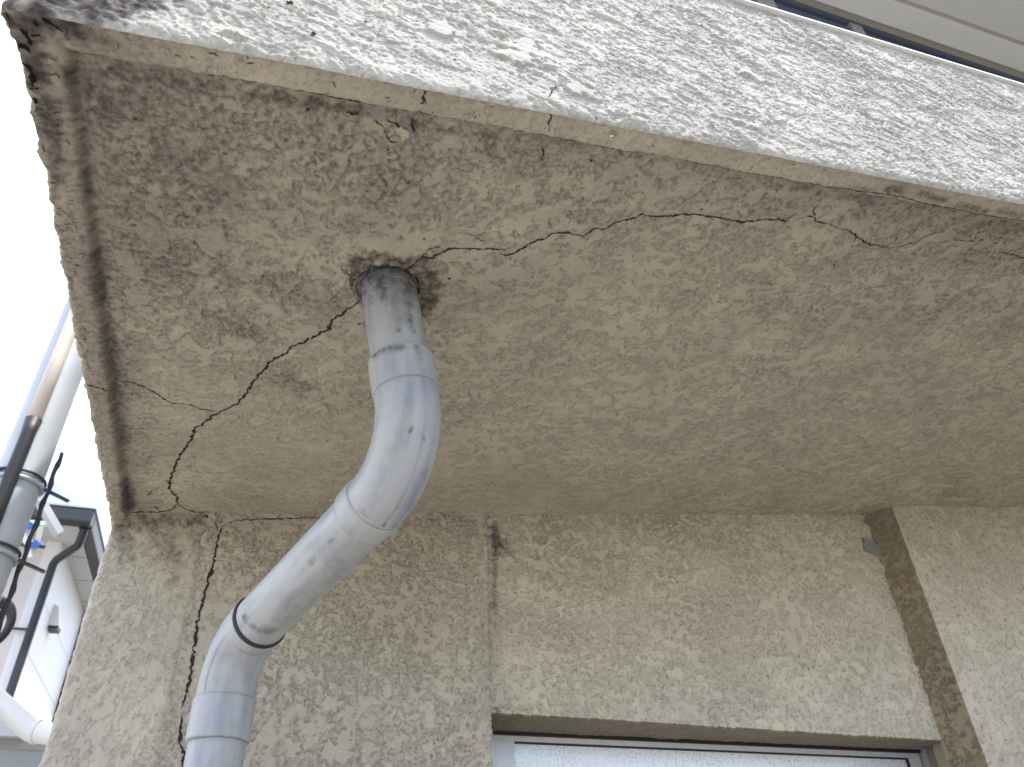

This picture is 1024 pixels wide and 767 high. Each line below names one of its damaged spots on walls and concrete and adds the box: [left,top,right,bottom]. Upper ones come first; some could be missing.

crack [166,48,1024,270]
crack [49,170,91,296]
water stain [341,253,440,316]
water stain [121,478,135,512]
crack [84,301,360,767]